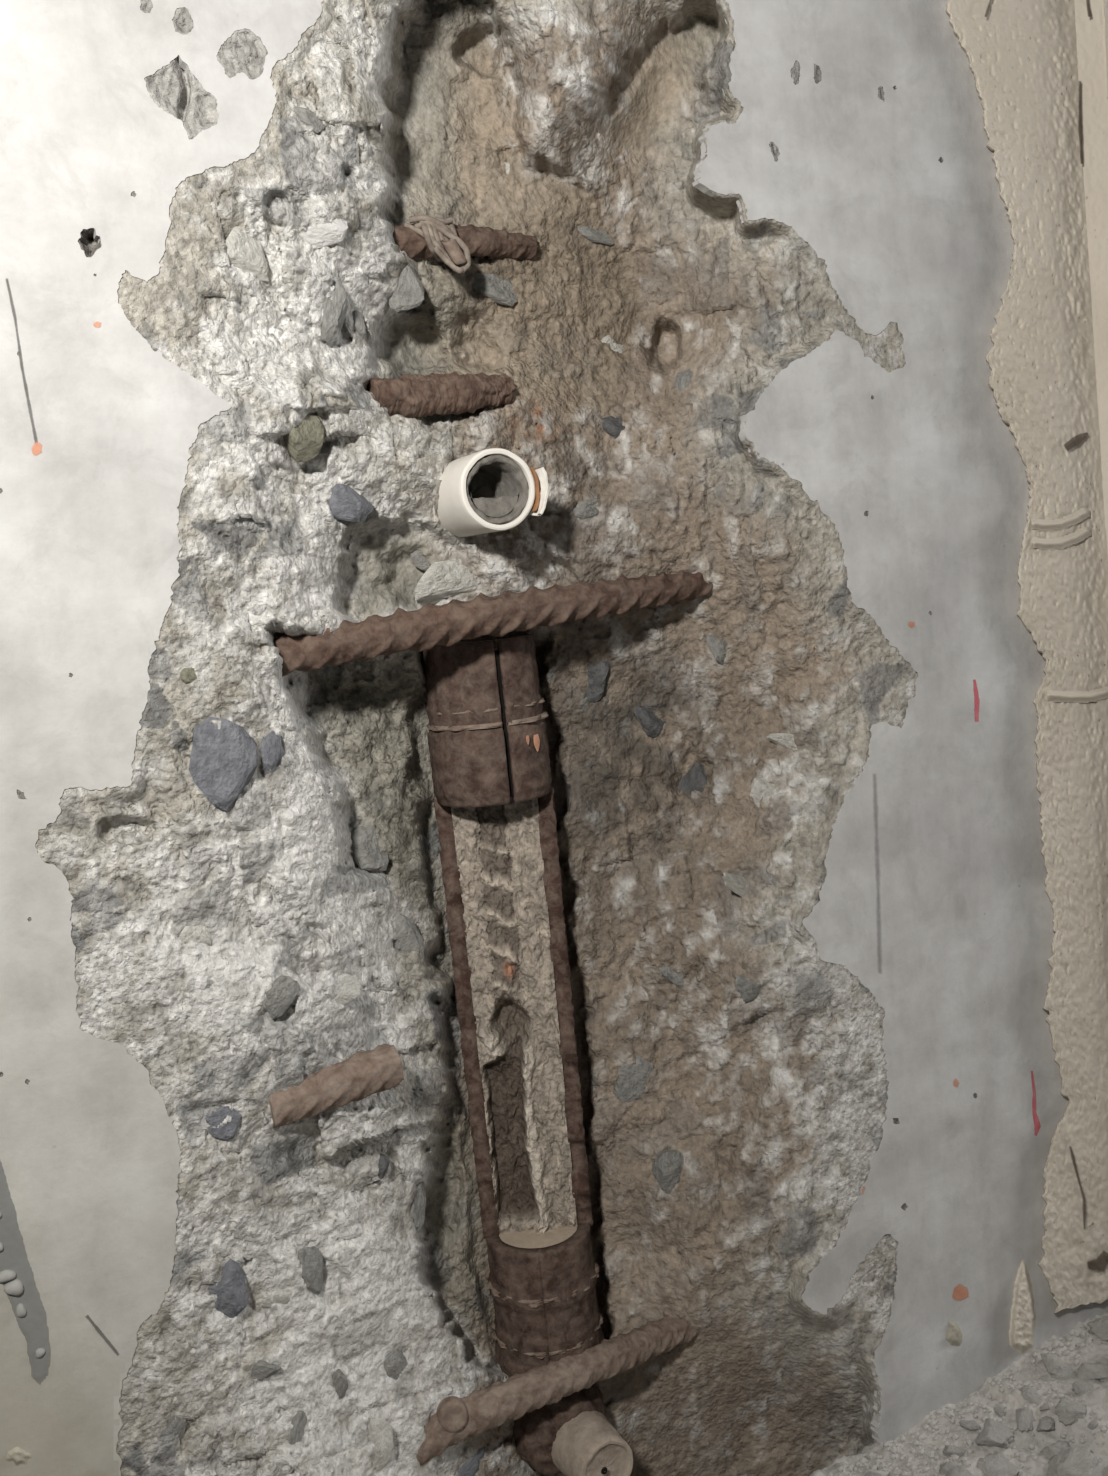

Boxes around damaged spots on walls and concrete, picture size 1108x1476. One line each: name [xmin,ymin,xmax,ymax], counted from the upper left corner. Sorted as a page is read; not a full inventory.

spalling [35,0,918,1476]
rust [526,734,540,752]